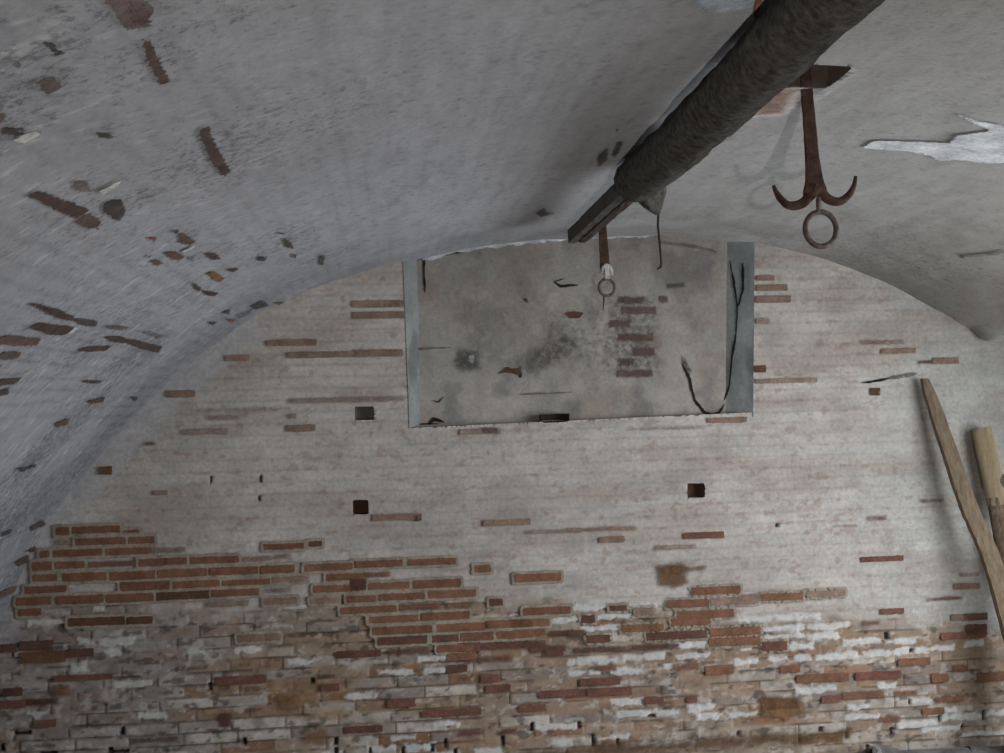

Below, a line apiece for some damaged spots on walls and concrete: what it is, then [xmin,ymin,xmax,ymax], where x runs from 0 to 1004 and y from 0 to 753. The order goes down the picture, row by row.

spalling [105,0,170,85]
spalling [27,180,126,229]
crack [419,239,567,292]
crack [554,278,577,288]
spalling [0,303,163,366]
crack [418,344,451,352]
crack [591,235,745,414]
crack [520,389,571,397]
peeling [0,518,848,673]
peeling [519,665,632,712]
peeling [780,657,1004,703]
damp [530,732,846,753]